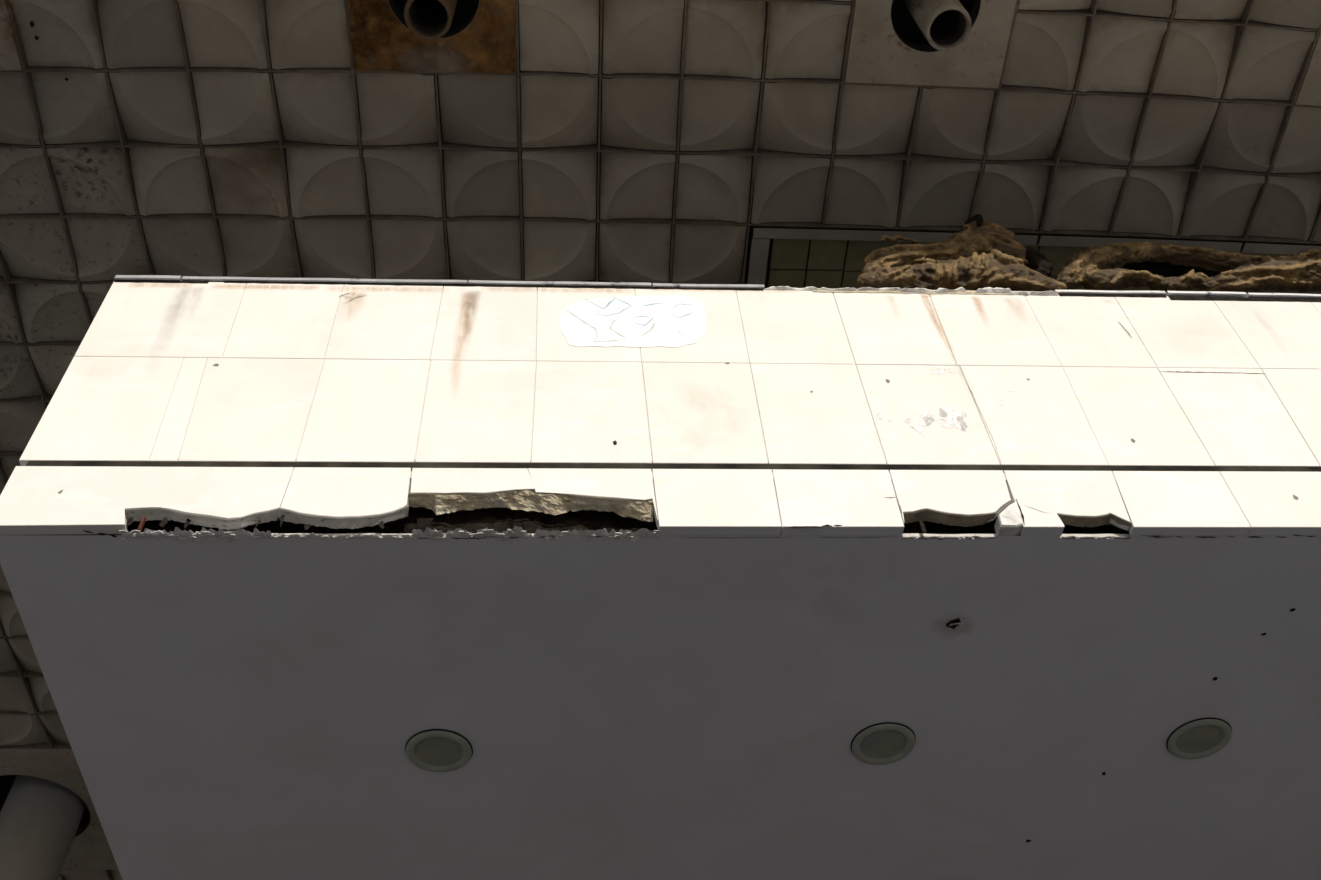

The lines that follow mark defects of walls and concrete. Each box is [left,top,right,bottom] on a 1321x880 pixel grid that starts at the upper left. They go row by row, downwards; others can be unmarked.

rust [347,0,516,73]
spalling [118,490,661,543]
spalling [903,510,998,540]
spalling [1058,514,1132,540]